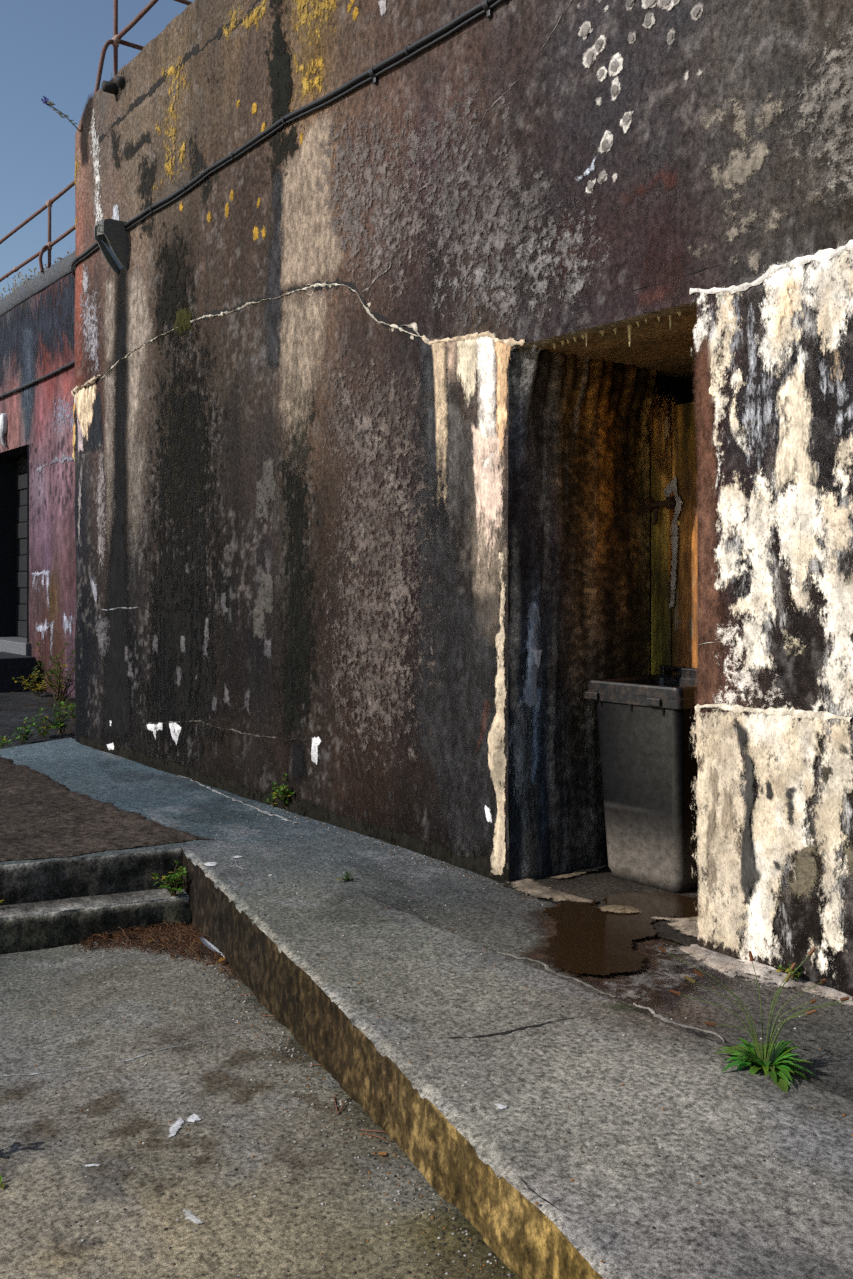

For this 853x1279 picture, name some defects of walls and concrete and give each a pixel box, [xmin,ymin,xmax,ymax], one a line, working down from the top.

leakage [71,123,297,823]
leakage [263,0,343,779]
crack [98,0,572,381]
leakage [415,240,853,1007]
crack [442,952,724,1046]